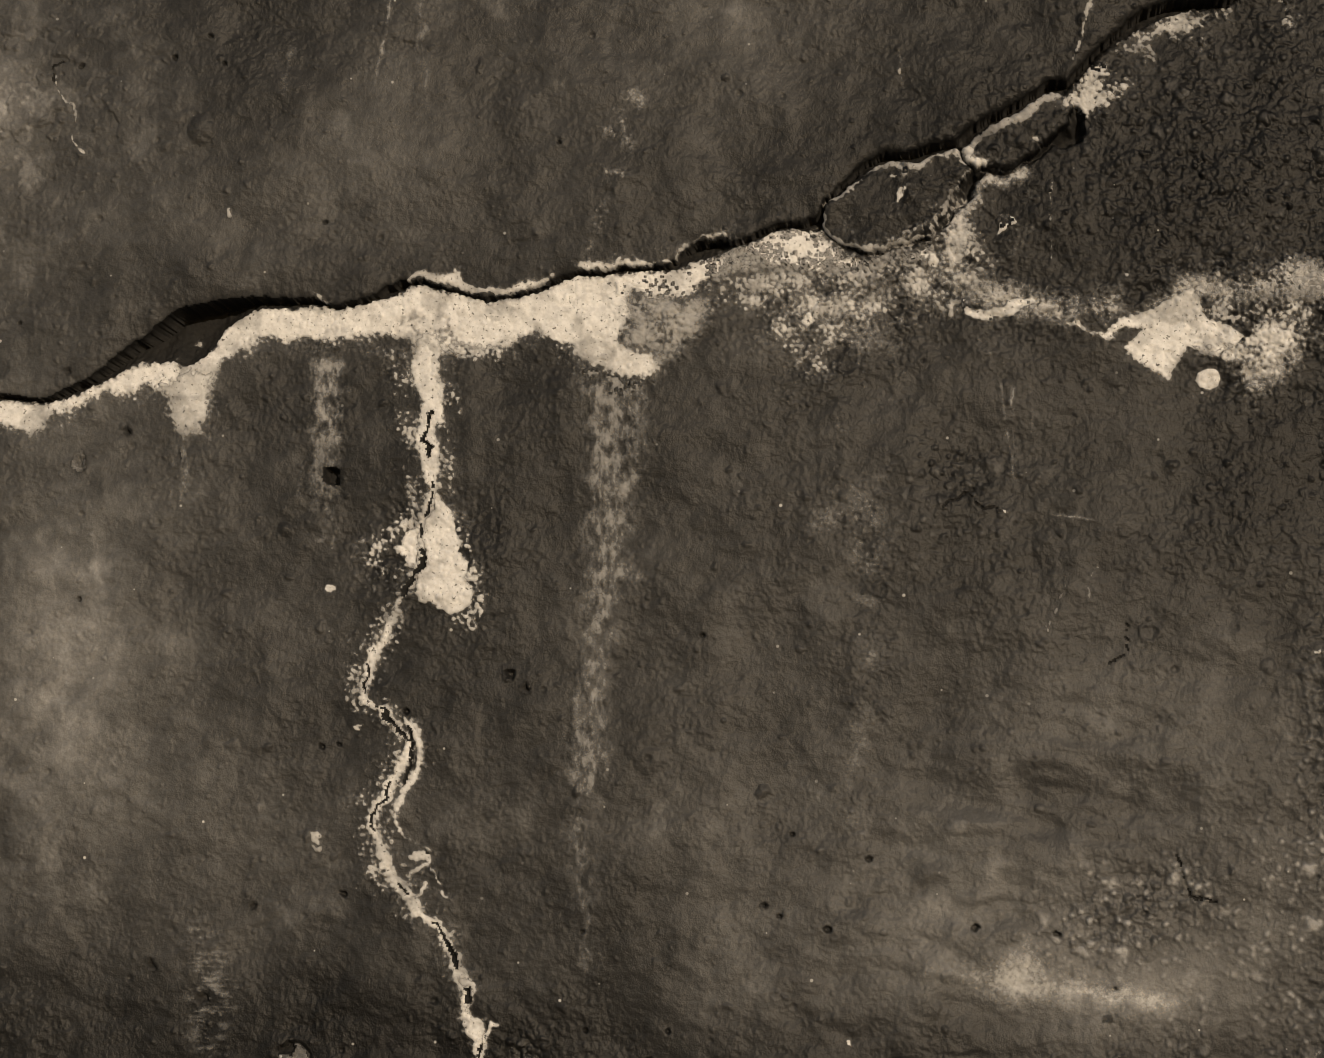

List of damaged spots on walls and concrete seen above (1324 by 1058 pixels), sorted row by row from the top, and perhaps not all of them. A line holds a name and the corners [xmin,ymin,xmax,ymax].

crack [344,310,499,1058]
damp [0,167,1027,924]
crack [0,0,1238,405]